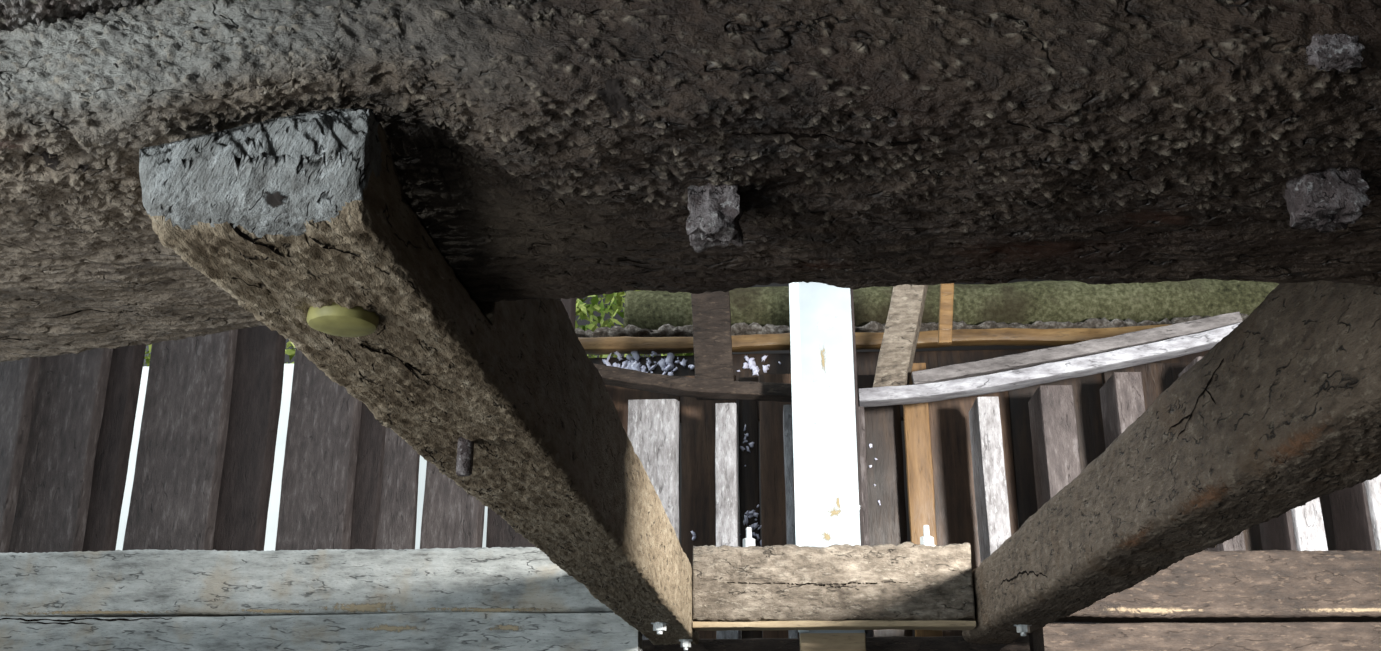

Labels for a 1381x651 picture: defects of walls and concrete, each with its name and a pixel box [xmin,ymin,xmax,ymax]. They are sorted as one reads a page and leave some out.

crack [1169,358,1224,439]
crack [1001,570,1047,585]